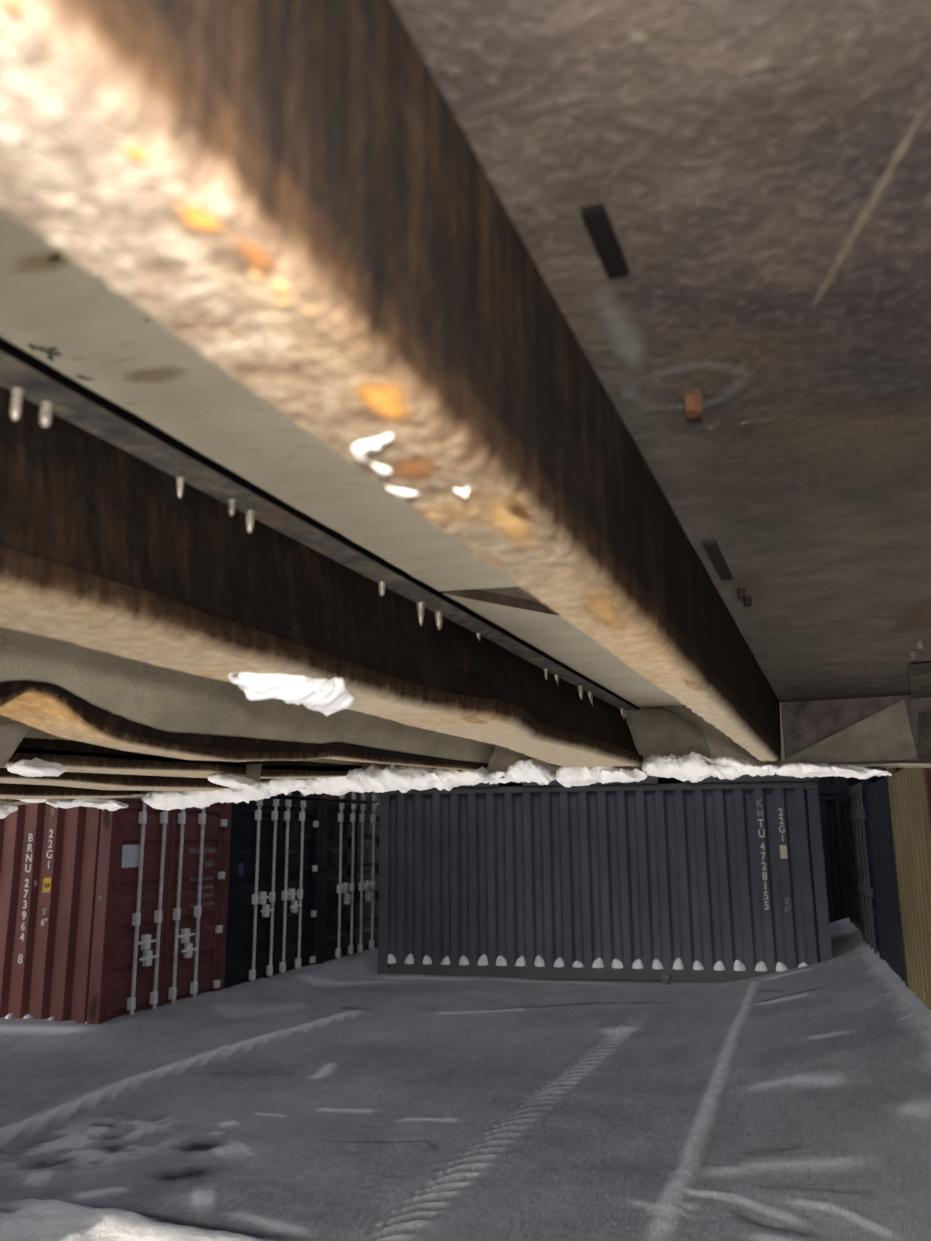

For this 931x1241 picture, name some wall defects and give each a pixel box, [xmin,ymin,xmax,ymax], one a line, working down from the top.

rust [182,206,220,230]
rust [237,239,289,304]
rust [360,384,407,419]
rust [392,458,435,481]
rust [491,500,532,544]